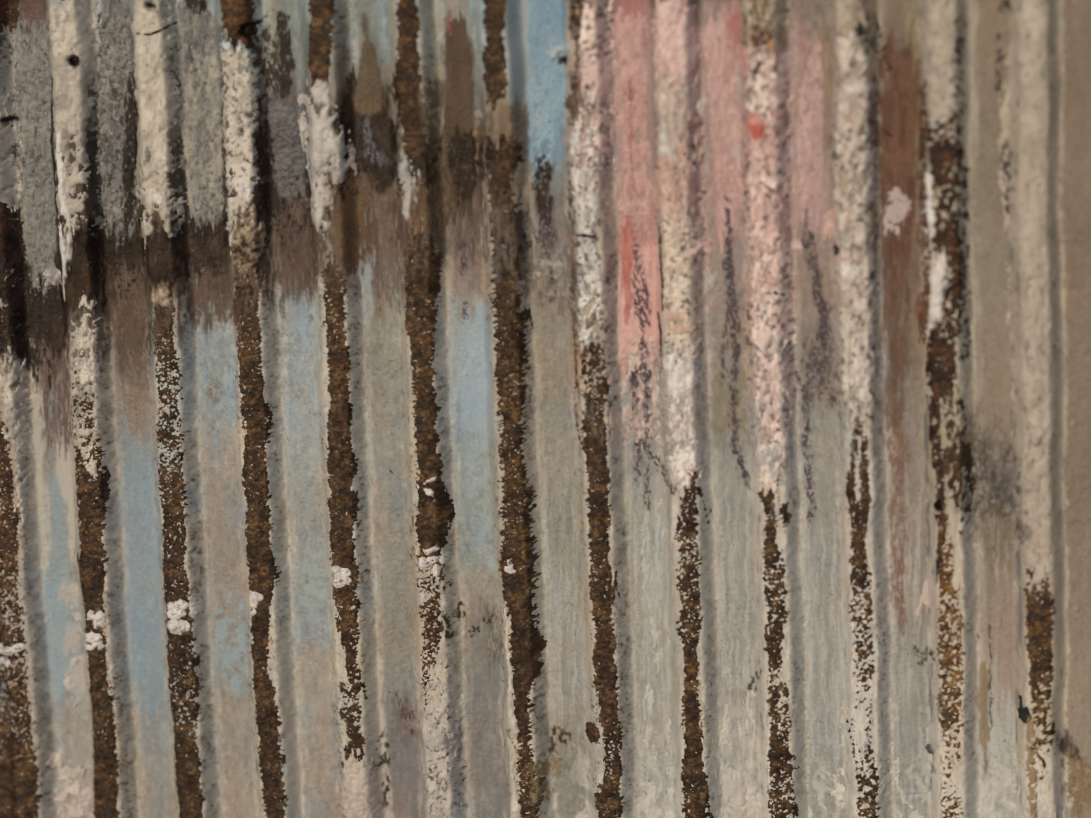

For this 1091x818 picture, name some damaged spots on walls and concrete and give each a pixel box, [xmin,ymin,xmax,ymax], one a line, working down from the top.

rust [0,420,43,818]
rust [72,370,120,818]
rust [152,304,206,818]
rust [234,268,288,818]
rust [320,249,368,768]
rust [403,221,456,706]
rust [484,133,571,818]
rust [568,232,625,818]
rust [674,471,714,818]
rust [757,482,800,818]
rust [845,415,881,818]
rust [871,31,977,818]